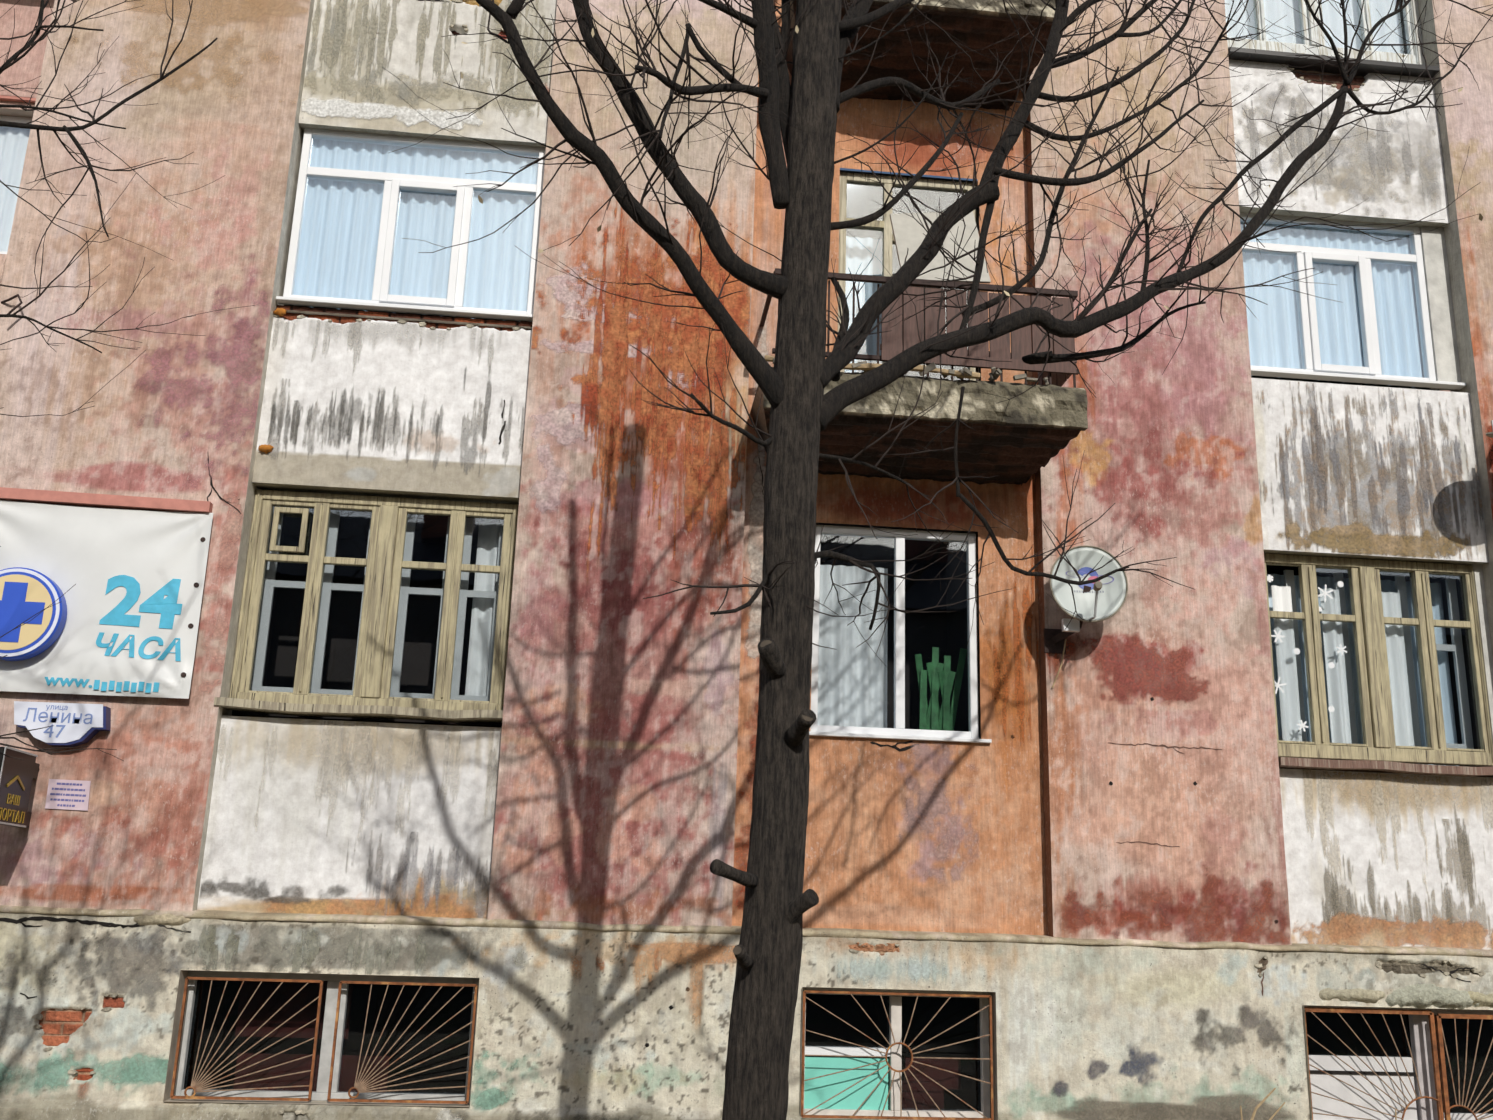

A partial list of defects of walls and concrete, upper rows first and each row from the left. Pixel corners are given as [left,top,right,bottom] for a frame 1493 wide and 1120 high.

water stain [138,0,552,117]
water stain [269,389,442,467]
water stain [461,382,524,472]
rust [532,327,540,349]
rust [561,207,750,560]
water stain [1259,382,1483,559]
water stain [1303,770,1493,931]
peeling [32,993,168,1088]